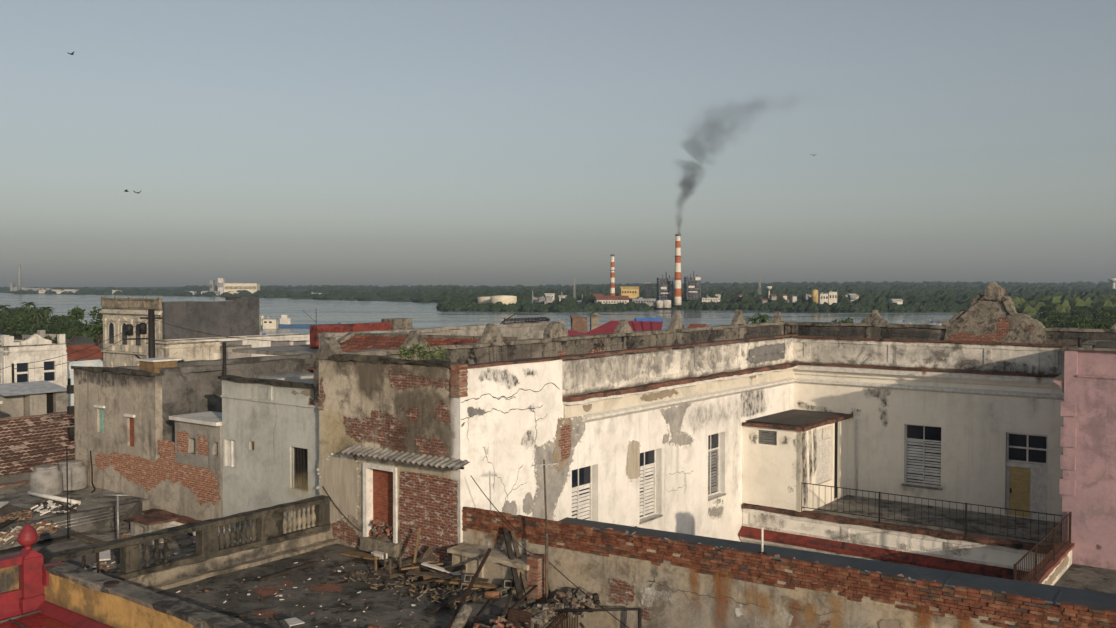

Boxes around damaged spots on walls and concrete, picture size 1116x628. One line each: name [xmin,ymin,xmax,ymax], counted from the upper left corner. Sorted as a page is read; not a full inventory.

flaking render [79,430,221,506]
peeling [316,364,486,548]
flaking render [399,471,458,562]
crack [461,383,559,501]
peeling [521,404,592,520]
peeling [626,440,641,482]
peeling [558,343,786,449]
rust [714,572,728,628]